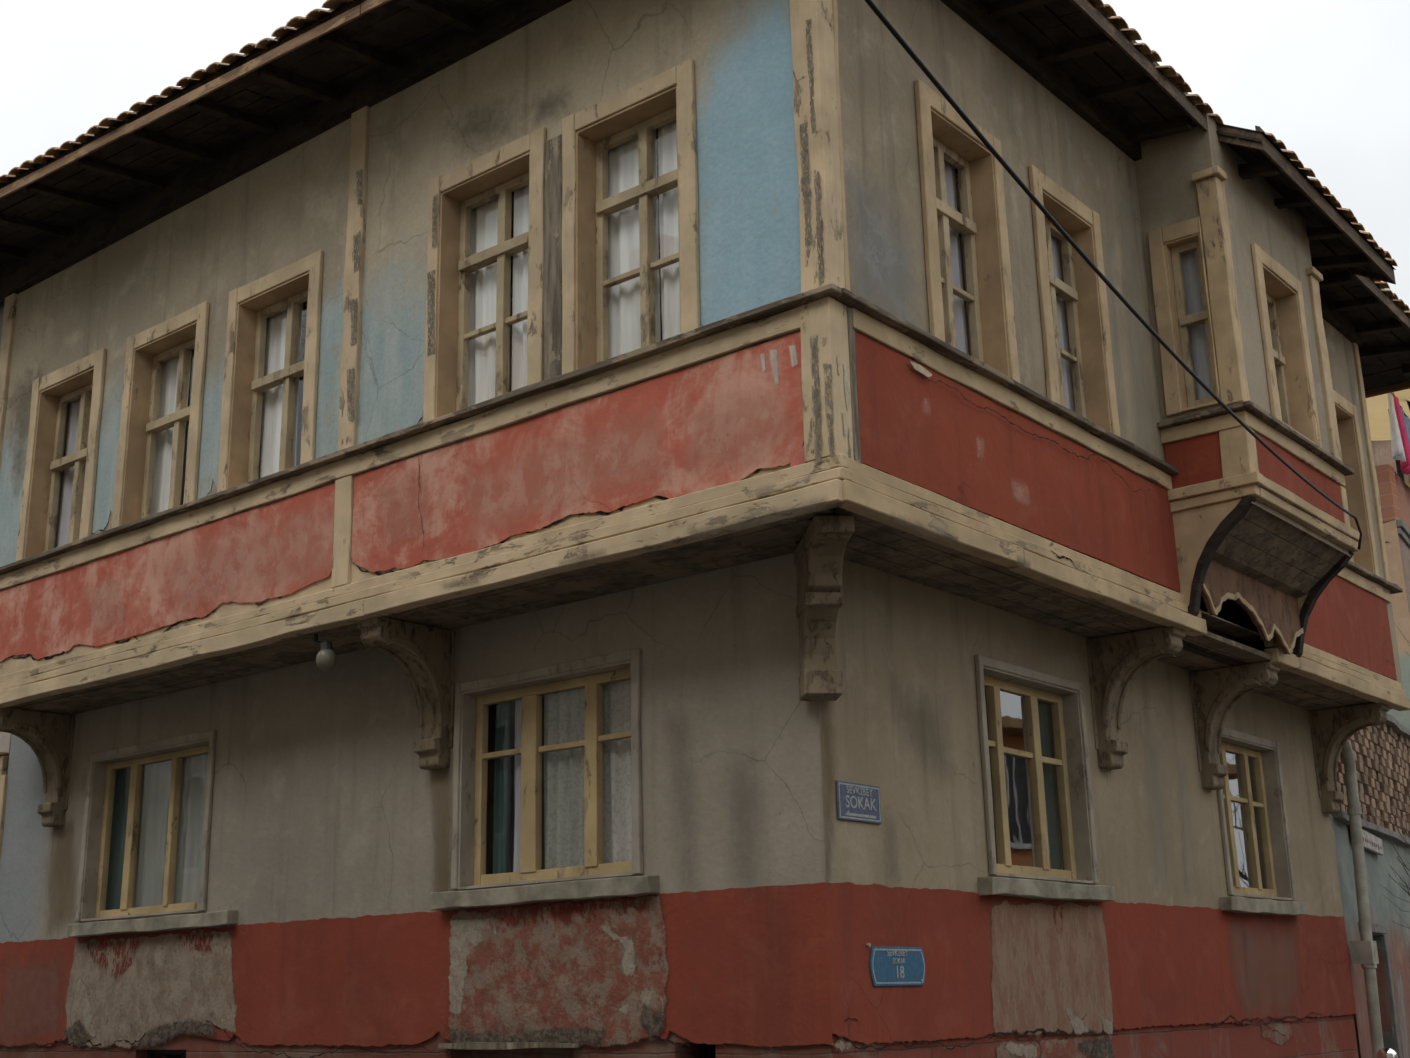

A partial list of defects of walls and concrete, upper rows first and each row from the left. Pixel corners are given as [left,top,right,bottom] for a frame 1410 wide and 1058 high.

peeling [800,19,824,285]
peeling [790,335,852,467]
crack [331,415,428,575]
crack [484,496,669,549]
spalling [64,930,237,1049]
spalling [448,895,669,1048]
spalling [990,899,1114,1058]
crack [1212,1012,1324,1036]